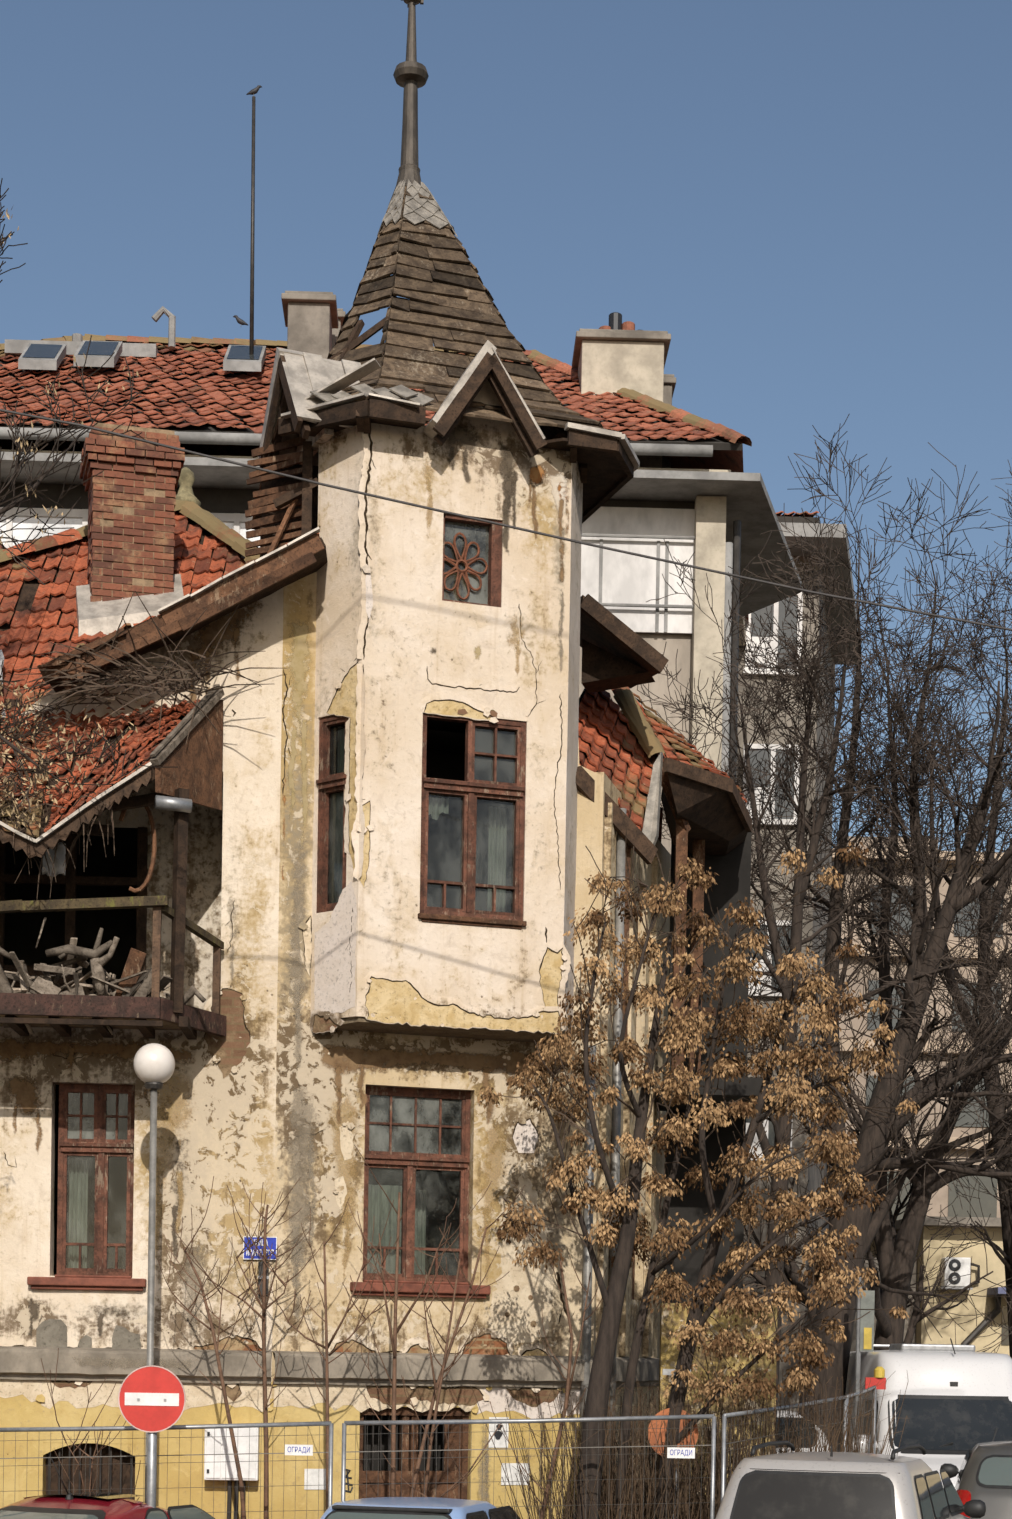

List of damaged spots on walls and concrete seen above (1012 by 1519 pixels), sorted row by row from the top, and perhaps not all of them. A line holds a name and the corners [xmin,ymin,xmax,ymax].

damp [425,425,479,524]
damp [500,443,517,552]
damp [549,474,567,535]
crack [344,432,375,803]
peeling [322,658,379,888]
peeling [310,940,571,1210]
damp [288,1090,316,1317]
peeling [457,1112,555,1356]
spalling [187,1330,269,1351]
spalling [328,1332,381,1353]
spalling [400,1337,434,1354]